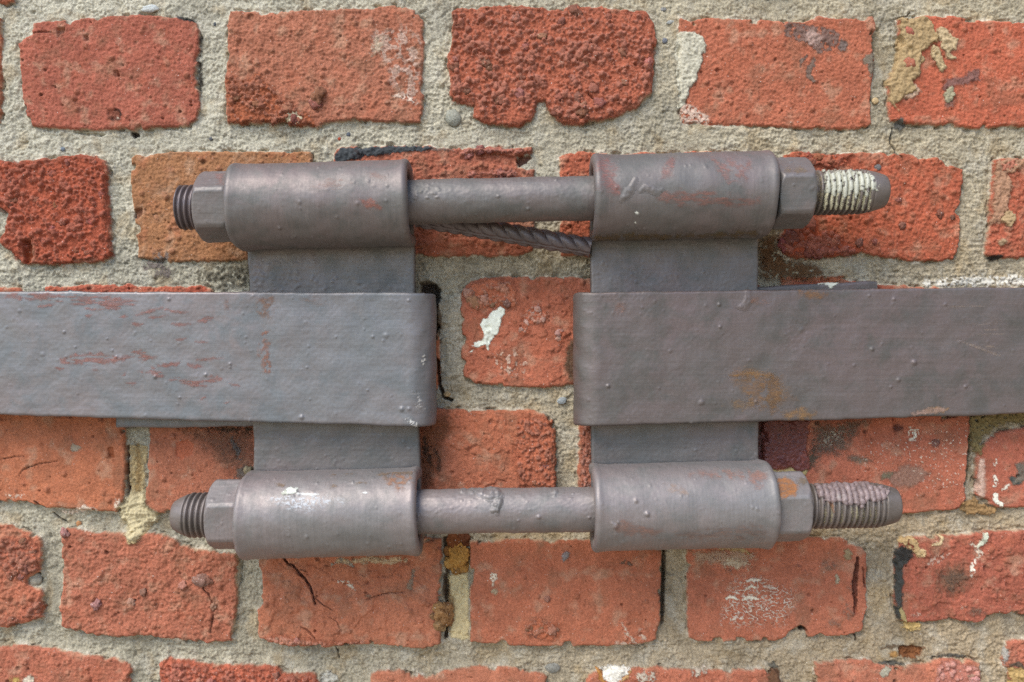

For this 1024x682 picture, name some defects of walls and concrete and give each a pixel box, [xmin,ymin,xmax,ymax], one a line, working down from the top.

peeling [904,27,959,72]
spalling [943,86,956,103]
spalling [463,279,548,335]
crack [284,558,341,651]
water stain [724,578,793,624]
crack [852,557,865,639]